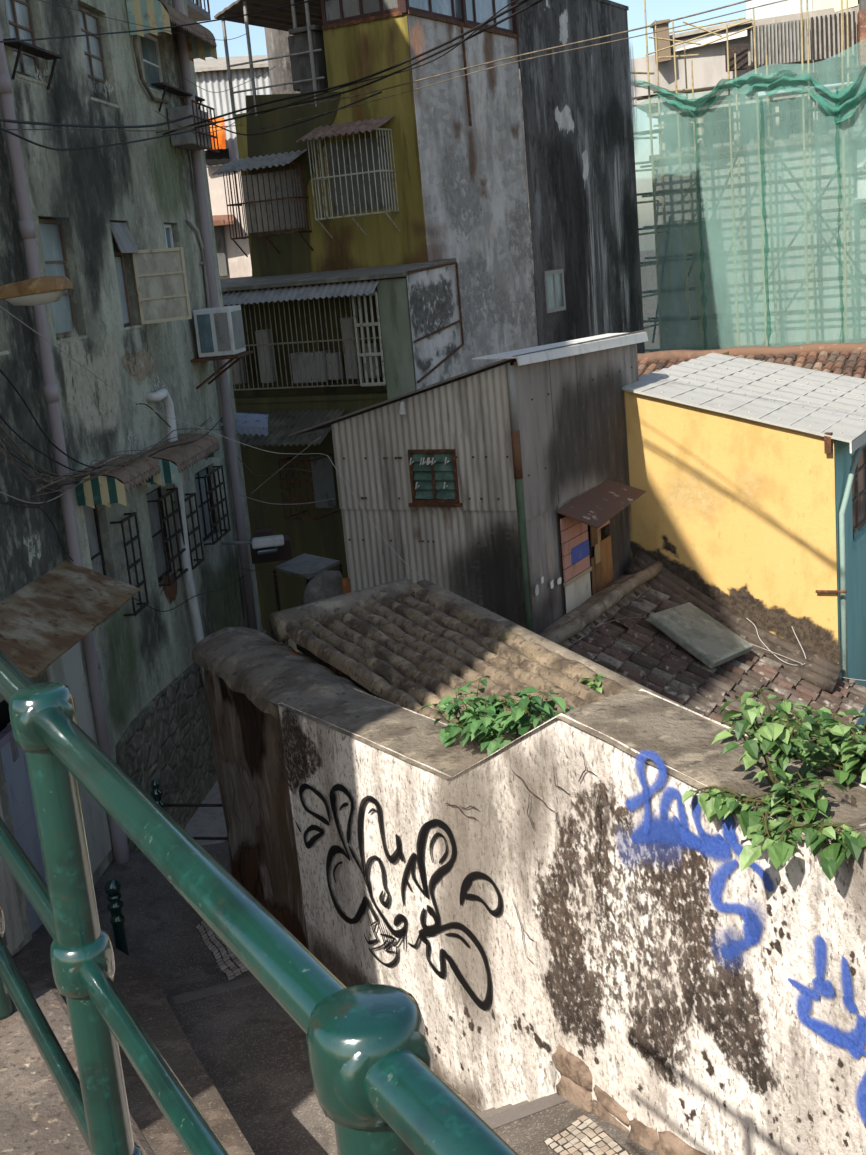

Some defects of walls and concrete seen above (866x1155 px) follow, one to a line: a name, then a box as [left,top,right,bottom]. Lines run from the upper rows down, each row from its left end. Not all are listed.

leakage [16,85,34,138]
leakage [47,0,130,303]
leakage [623,47,636,121]
leakage [579,132,622,336]
leakage [620,275,629,331]
leakage [549,372,630,502]
leakage [605,505,841,663]
leakage [218,677,368,988]
peeling [797,1058,843,1141]